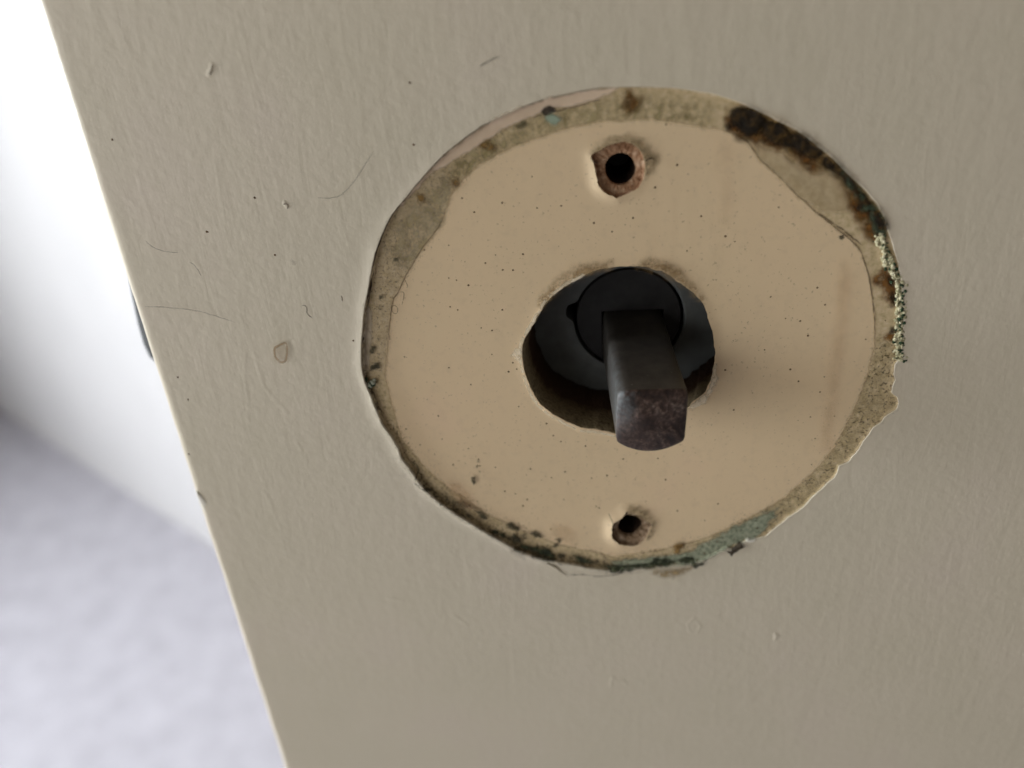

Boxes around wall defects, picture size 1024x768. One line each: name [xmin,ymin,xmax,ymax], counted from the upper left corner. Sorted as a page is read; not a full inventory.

water stain [411,461,776,573]